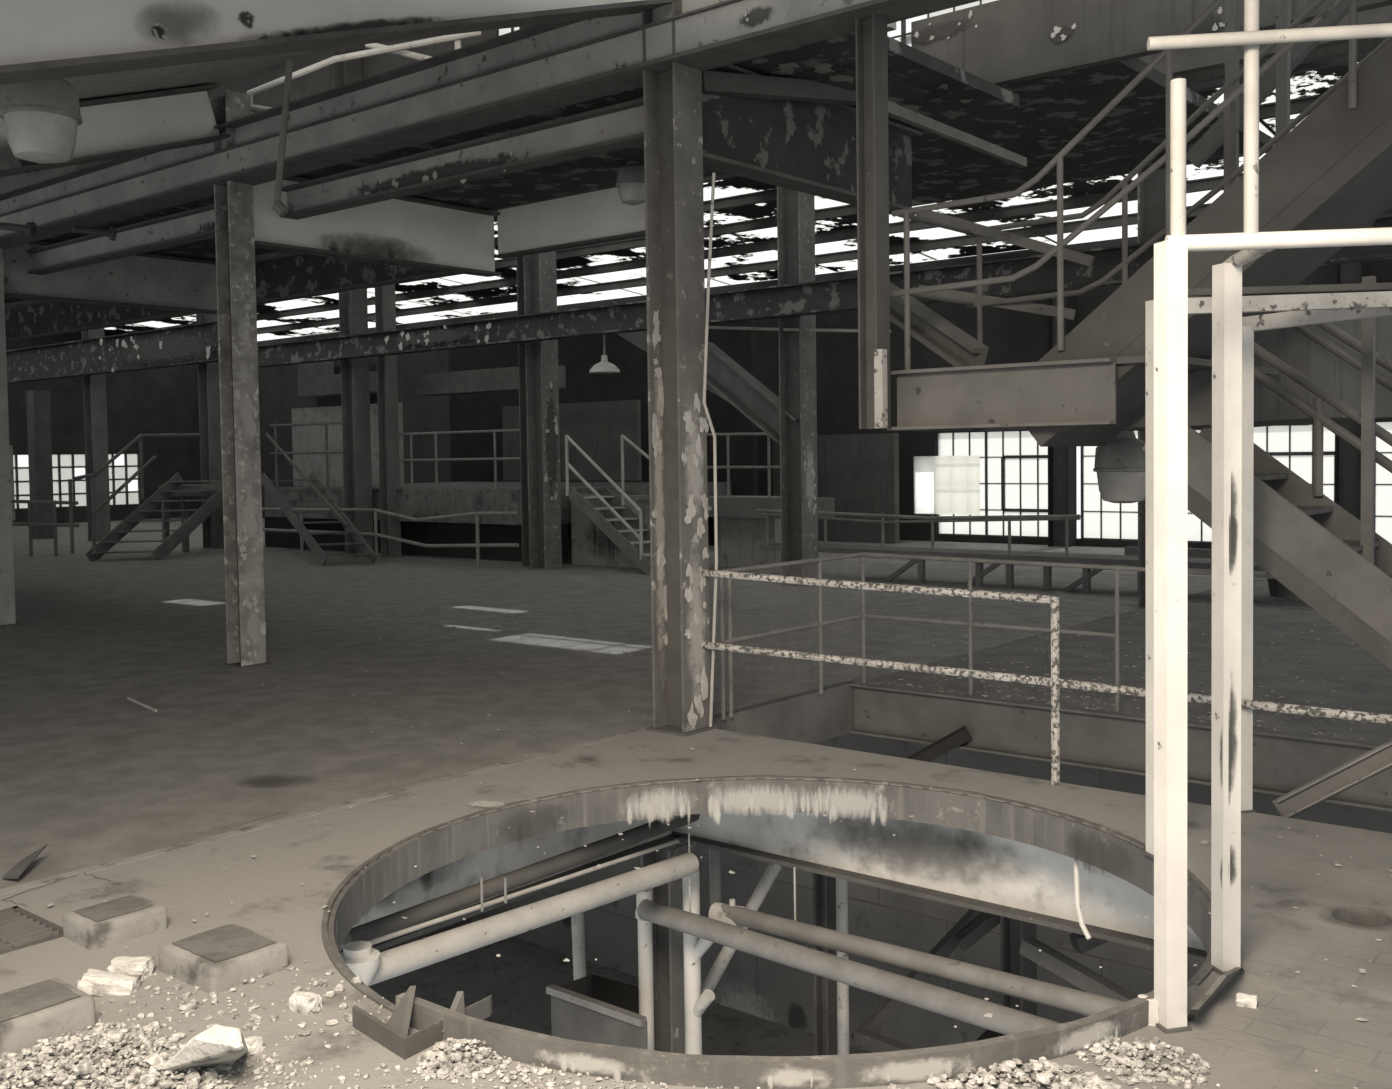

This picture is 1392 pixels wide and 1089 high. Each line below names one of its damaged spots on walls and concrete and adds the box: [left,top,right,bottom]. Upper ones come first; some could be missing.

peeling [98,332,218,372]
peeling [384,322,491,350]
peeling [652,309,709,730]
water stain [628,791,690,823]
water stain [709,789,977,869]